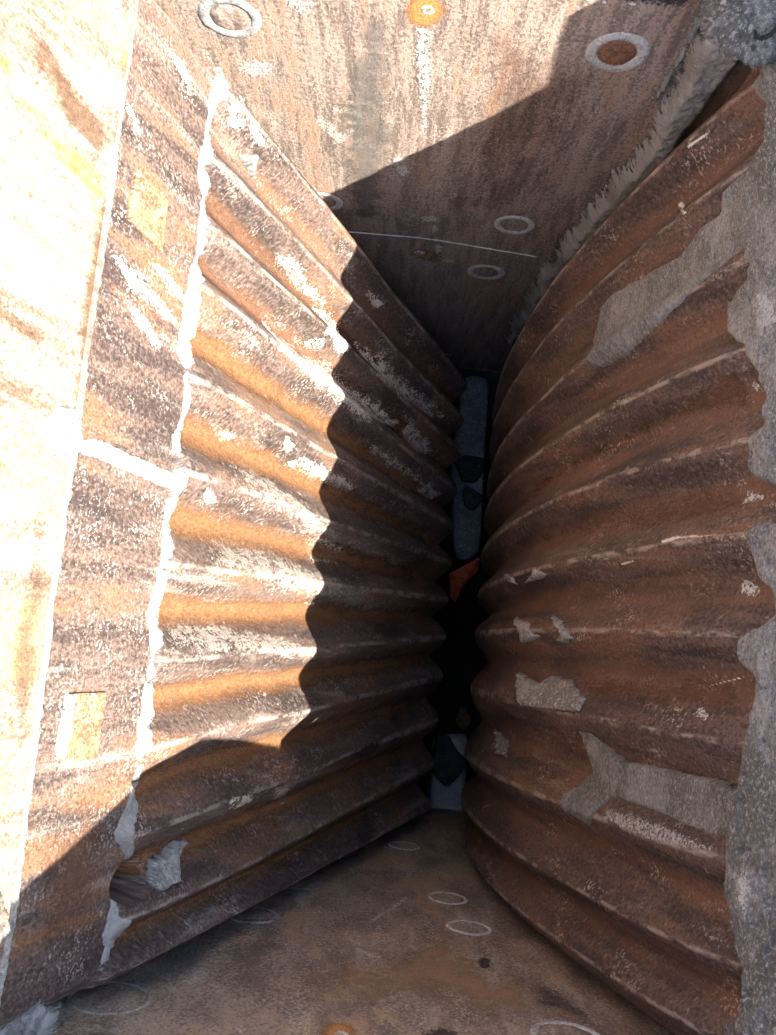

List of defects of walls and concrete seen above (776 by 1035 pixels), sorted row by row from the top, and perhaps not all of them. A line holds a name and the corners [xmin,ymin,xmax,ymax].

damp [284,0,316,15]
corrosion [406,0,446,27]
damp [235,58,277,78]
corrosion [198,258,407,439]
corrosion [188,329,423,494]
corrosion [180,414,430,541]
corrosion [168,498,415,581]
corrosion [156,593,415,632]
corrosion [152,651,423,716]
corrosion [134,696,415,803]
damp [0,998,62,1035]
damp [422,1027,457,1035]